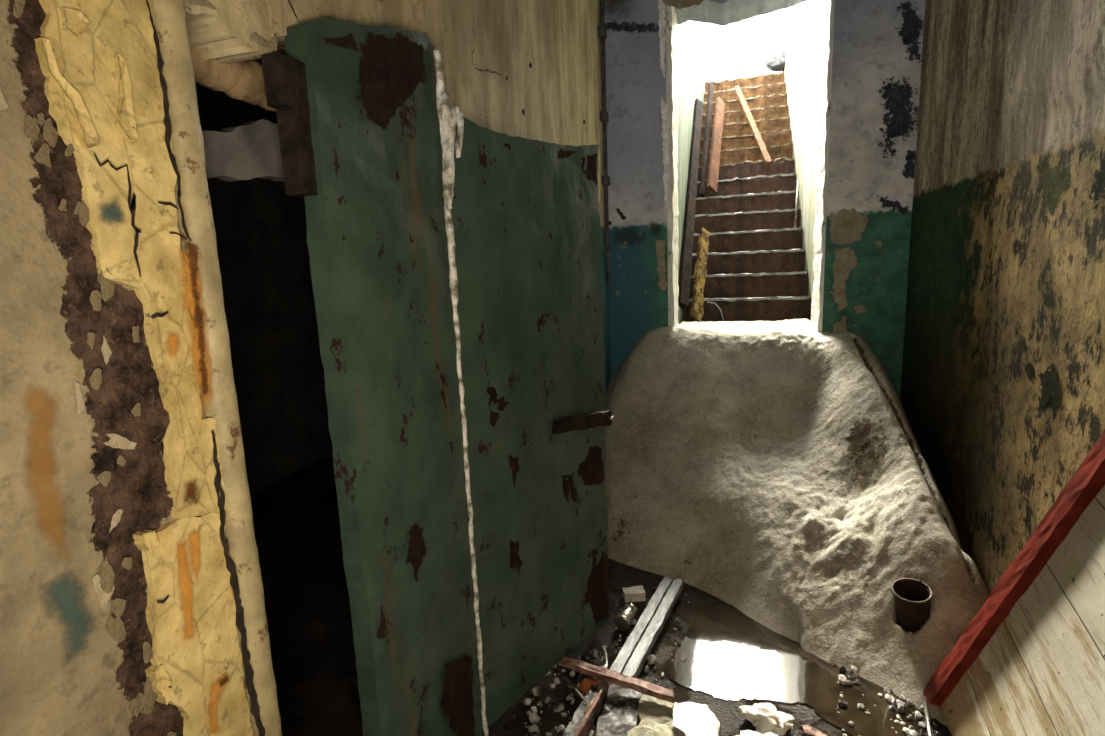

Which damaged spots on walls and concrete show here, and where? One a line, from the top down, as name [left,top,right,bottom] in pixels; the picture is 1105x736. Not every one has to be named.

crack [94,0,192,277]
peeling [1035,158,1072,217]
peeling [1084,148,1105,213]
peeling [828,207,868,333]
peeling [6,0,253,736]